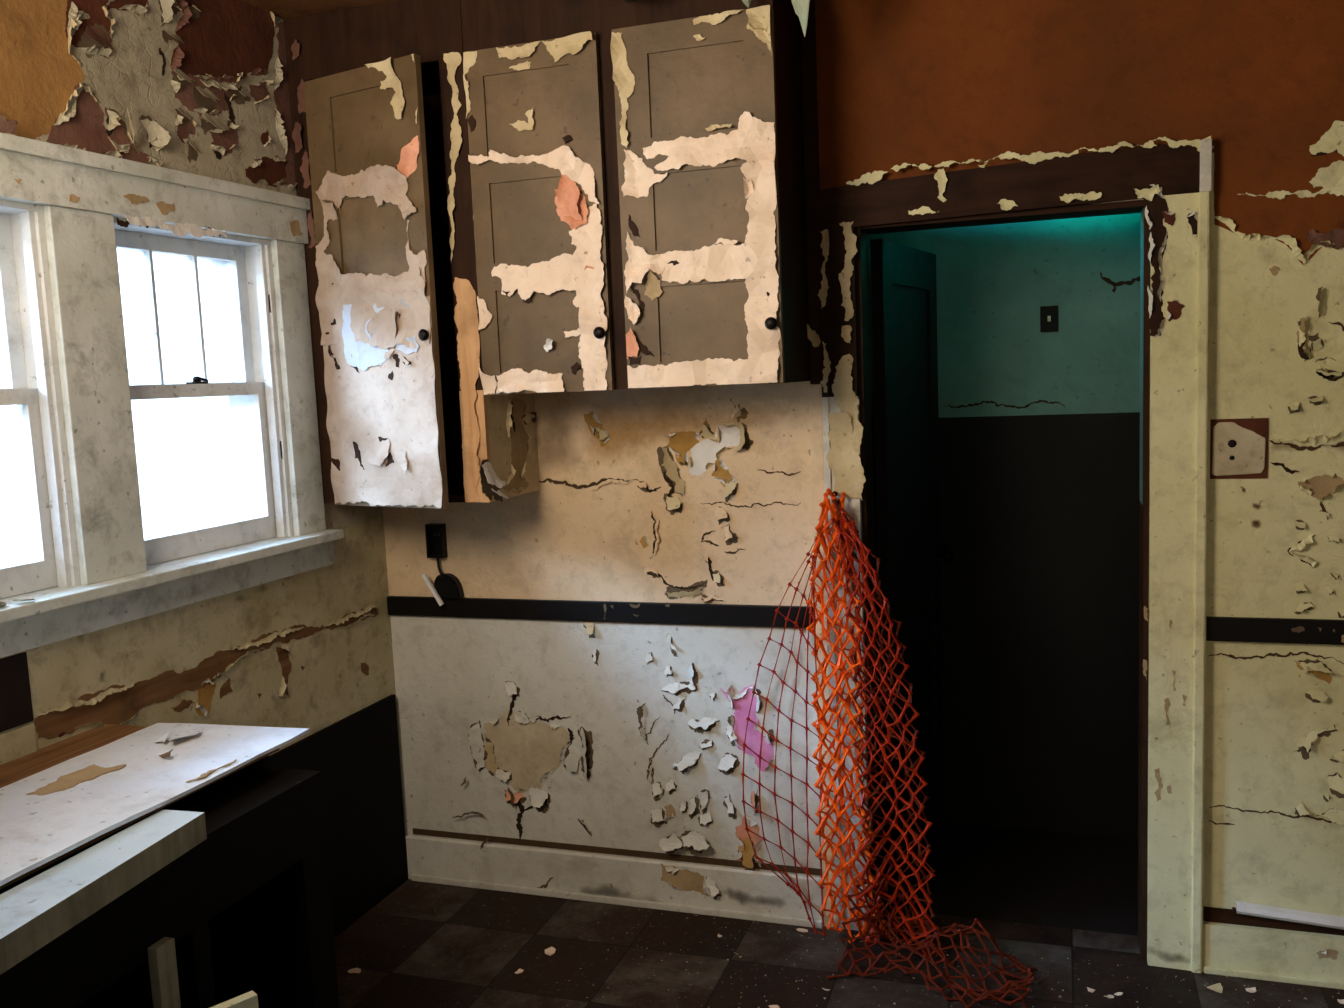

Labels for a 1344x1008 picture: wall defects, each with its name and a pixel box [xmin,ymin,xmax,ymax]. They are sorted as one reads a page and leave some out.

peeling [0,0,297,191]
peeling [791,0,1344,266]
crack [1100,272,1140,293]
peeling [1135,183,1198,337]
crack [539,478,661,559]
peeling [643,399,753,607]
crack [701,469,801,508]
crack [1269,431,1344,474]
peeling [34,604,380,739]
crack [1209,652,1344,684]
peeling [720,685,775,772]
crack [1208,805,1332,825]